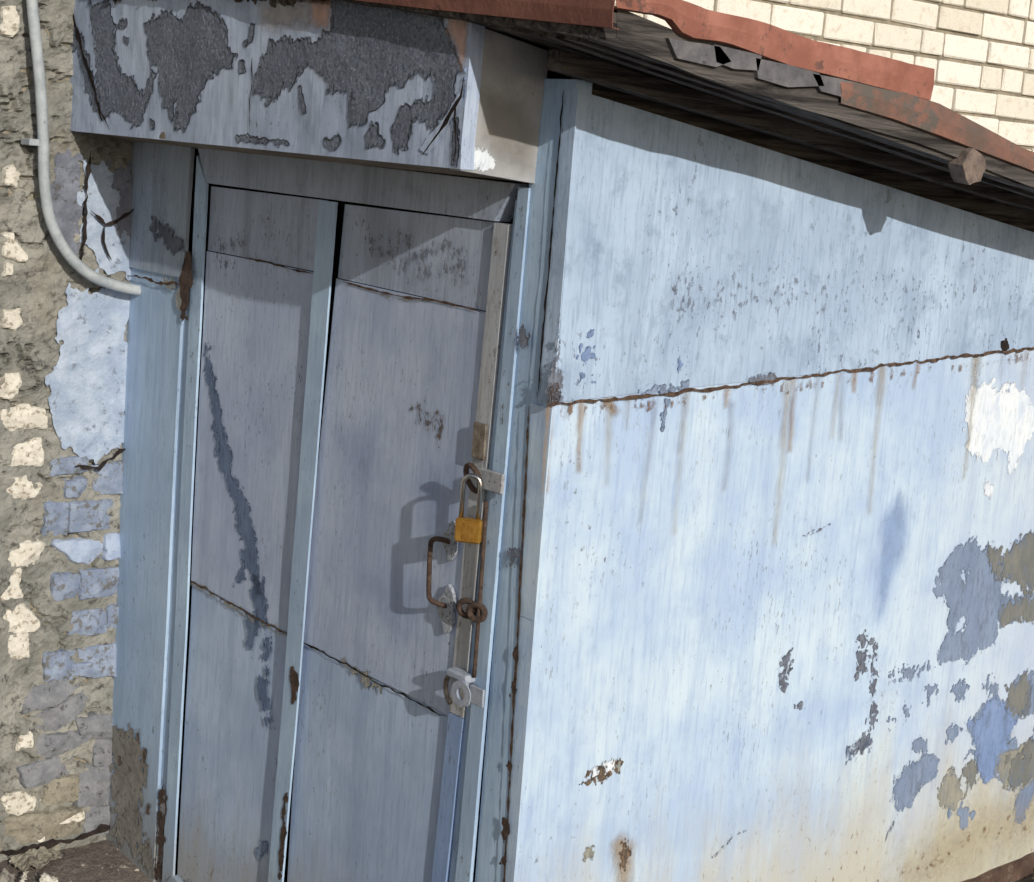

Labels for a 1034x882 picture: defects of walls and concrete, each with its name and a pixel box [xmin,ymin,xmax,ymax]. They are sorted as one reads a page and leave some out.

peeling [70,0,467,168]
peeling [50,149,133,281]
crack [79,151,183,291]
peeling [45,282,130,464]
corrosion [544,339,1034,420]
peeling [203,342,275,730]
corrosion [289,666,299,705]
peeling [846,530,1034,842]
peeling [109,723,155,878]
corrosion [154,784,170,881]
corrosion [278,792,288,880]
corrosion [615,838,632,882]